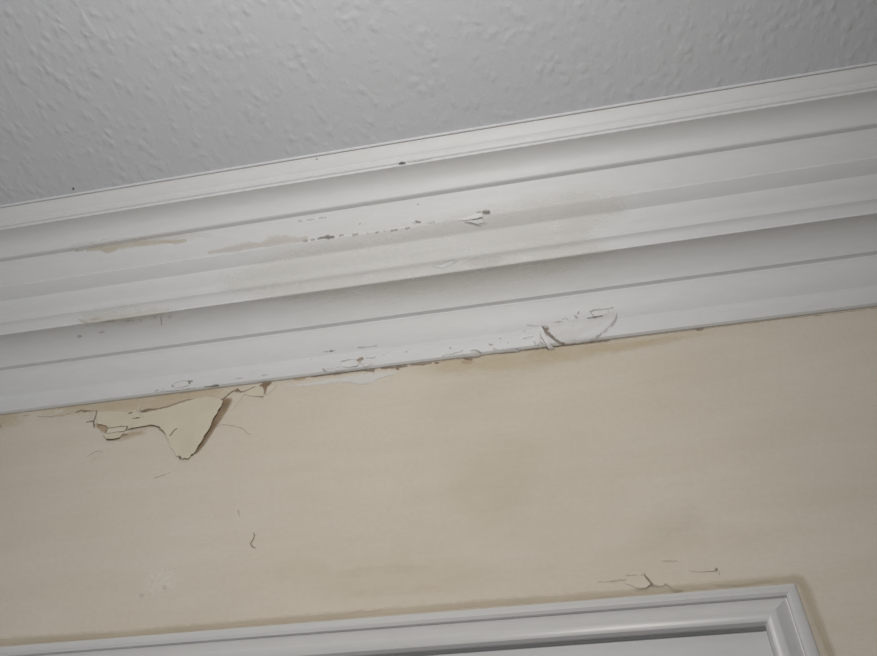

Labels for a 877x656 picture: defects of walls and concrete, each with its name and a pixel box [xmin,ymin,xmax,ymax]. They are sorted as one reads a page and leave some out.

peeling [459,210,490,226]
peeling [525,307,617,350]
peeling [323,345,377,372]
peeling [75,374,277,460]
crack [625,574,683,592]